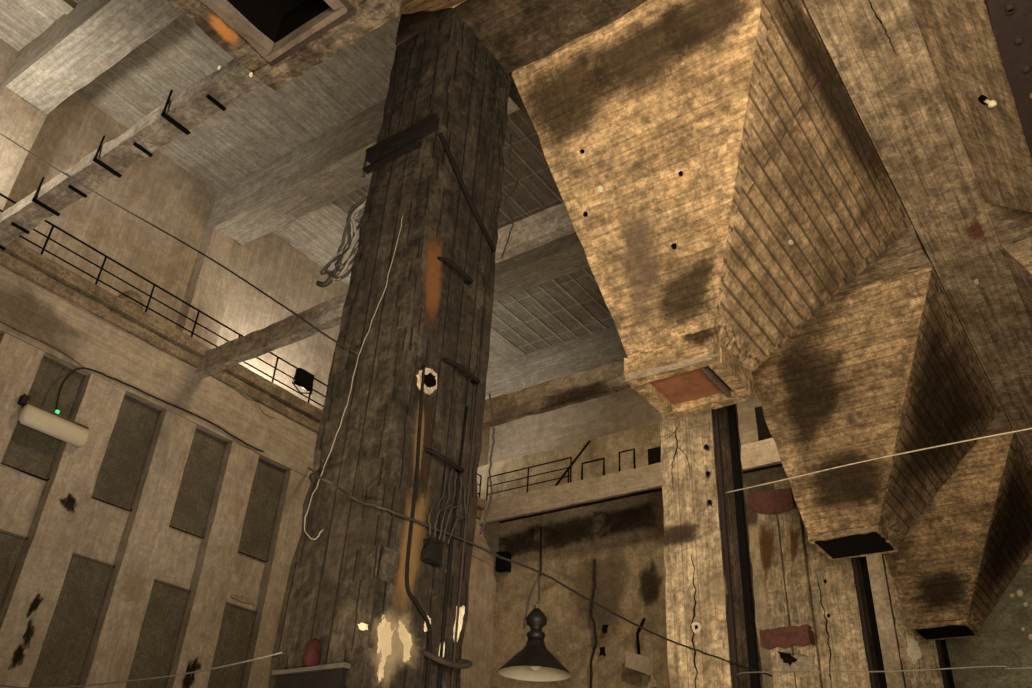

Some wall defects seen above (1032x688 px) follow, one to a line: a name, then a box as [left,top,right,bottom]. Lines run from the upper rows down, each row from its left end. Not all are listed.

rust [426,244,441,312]
peeling [358,615,413,682]
peeling [439,605,465,658]